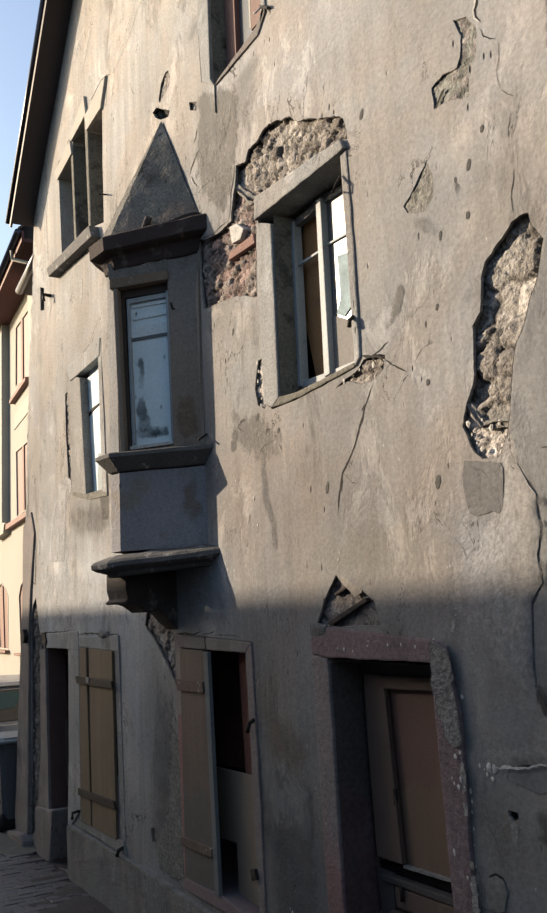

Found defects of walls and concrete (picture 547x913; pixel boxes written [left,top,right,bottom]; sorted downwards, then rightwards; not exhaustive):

spalling [431,17,476,109]
crack [472,0,513,136]
spalling [189,90,347,309]
spalling [403,163,433,213]
spalling [462,213,543,459]
crack [338,342,407,508]
spalling [145,612,178,684]
spalling [317,575,381,627]
peeling [428,463,547,831]
spalling [466,860,481,913]